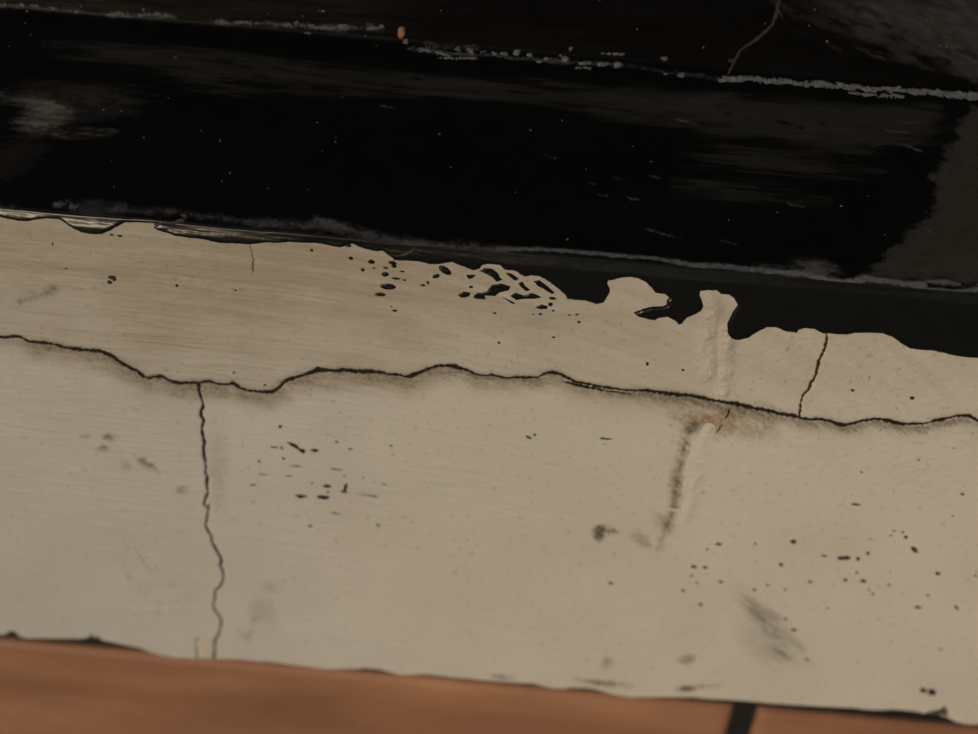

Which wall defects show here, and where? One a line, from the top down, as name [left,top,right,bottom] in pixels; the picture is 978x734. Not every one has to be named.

crack [727,0,783,74]
peeling [0,206,978,358]
crack [0,334,978,658]
leakage [821,539,874,595]